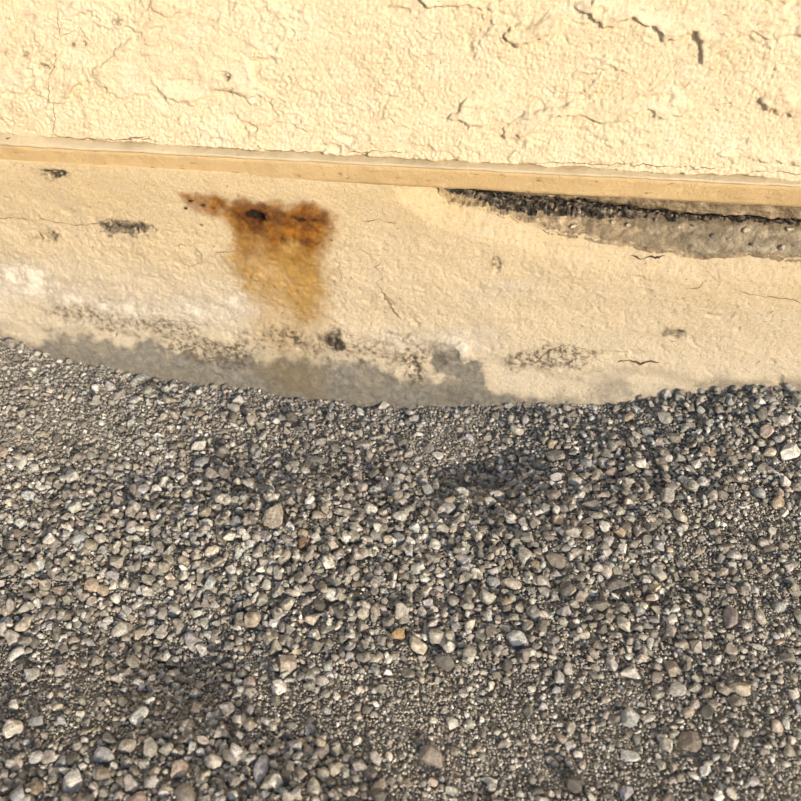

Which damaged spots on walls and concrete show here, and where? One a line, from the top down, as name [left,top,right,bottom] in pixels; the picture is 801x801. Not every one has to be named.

peeling [100,219,157,237]
corrosion [182,194,333,306]
spalling [439,188,801,263]
water stain [37,335,536,411]